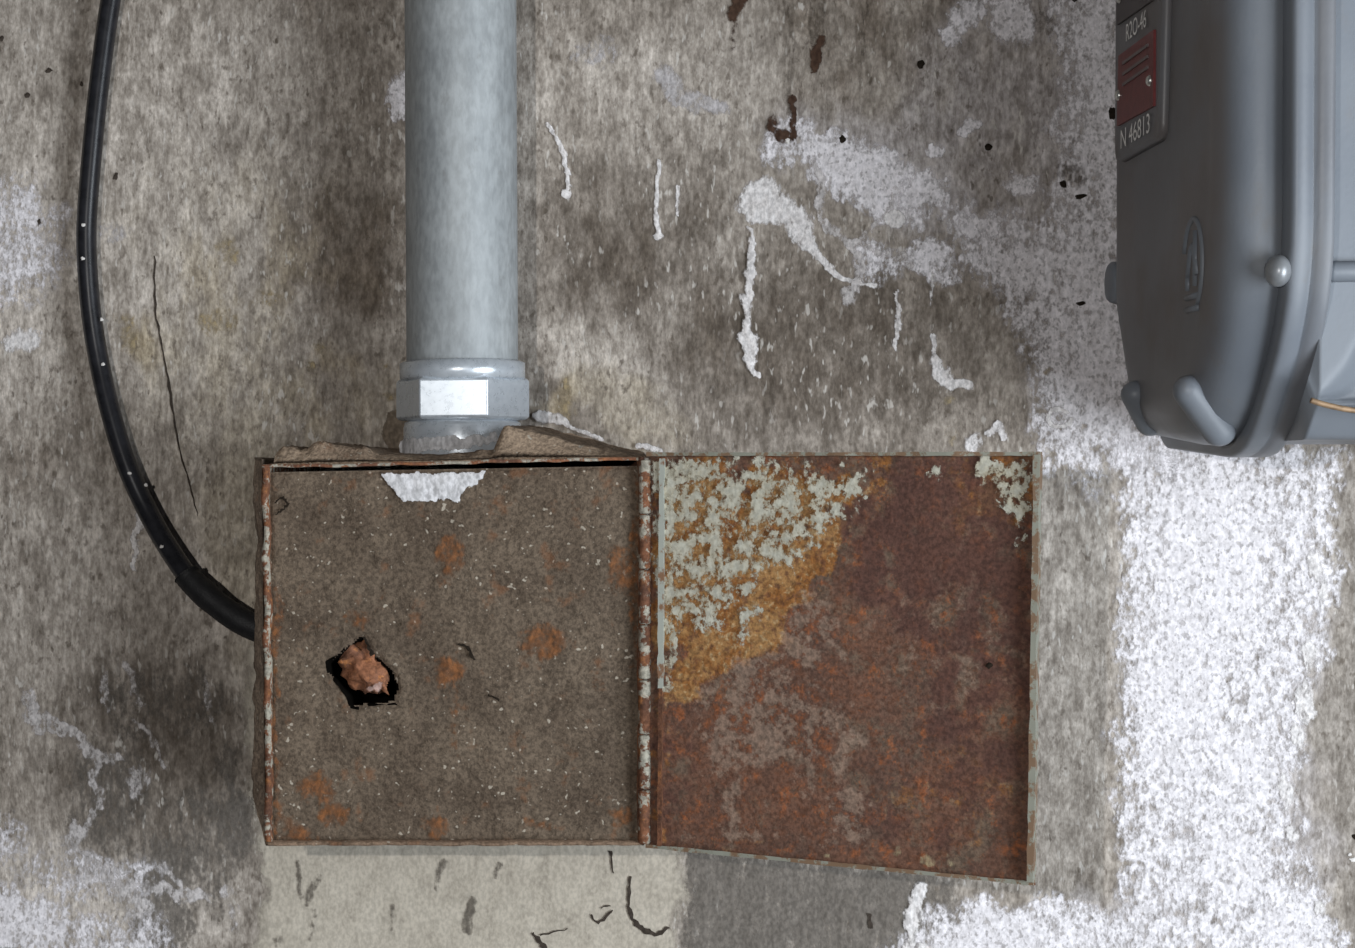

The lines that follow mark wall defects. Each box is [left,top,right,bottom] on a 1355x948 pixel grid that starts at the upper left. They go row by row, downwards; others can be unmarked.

rust [727,0,748,49]
rust [809,35,825,73]
rust [767,94,797,144]
water stain [682,0,1352,948]
spalling [325,637,399,710]